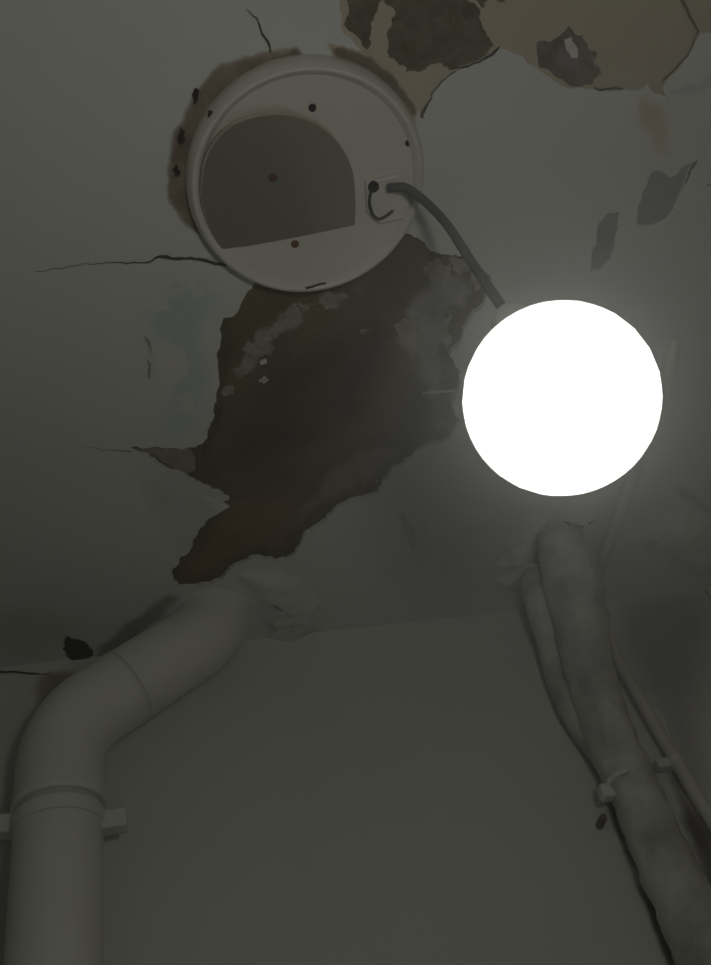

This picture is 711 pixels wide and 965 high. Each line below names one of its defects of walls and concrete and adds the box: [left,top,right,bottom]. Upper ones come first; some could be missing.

crack [247,10,272,53]
peeling [327,0,711,122]
spalling [637,163,693,225]
crack [36,255,227,272]
spalling [590,212,619,270]
spalling [131,234,490,584]